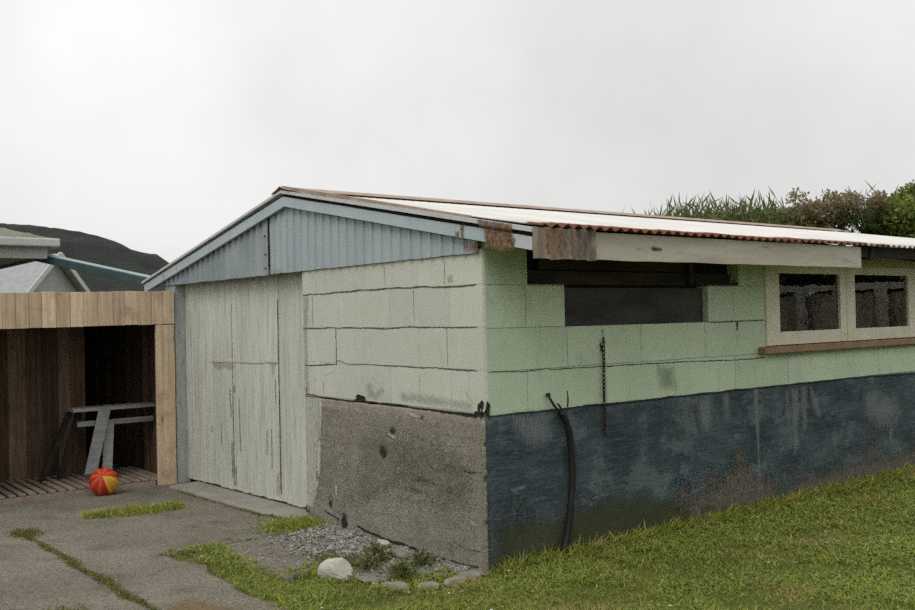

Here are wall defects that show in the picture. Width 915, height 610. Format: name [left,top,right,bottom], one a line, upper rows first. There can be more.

corrosion [455,219,515,252]